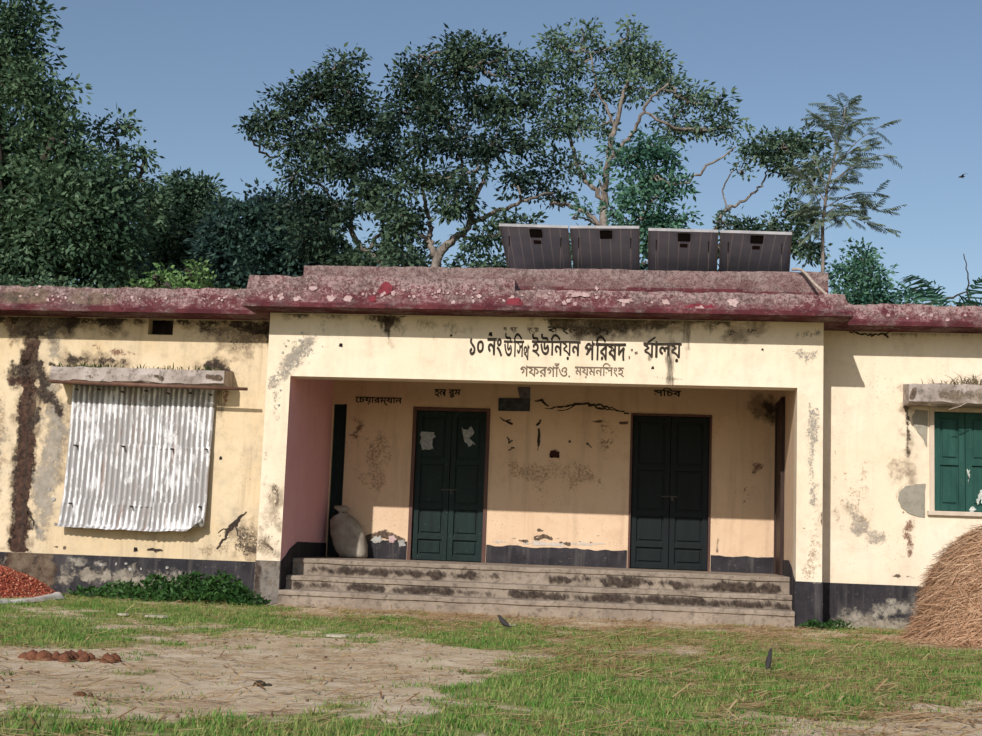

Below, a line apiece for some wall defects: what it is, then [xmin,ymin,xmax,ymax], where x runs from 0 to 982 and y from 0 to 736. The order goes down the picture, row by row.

peeling [326,282,419,302]
peeling [431,287,523,305]
peeling [544,286,599,306]
damp [172,320,270,349]
damp [548,318,730,337]
damp [203,358,230,371]
crack [500,399,629,451]
damp [0,316,143,586]
damp [808,404,819,505]
peeling [32,380,181,590]
crack [216,512,247,549]
spalling [492,528,604,546]